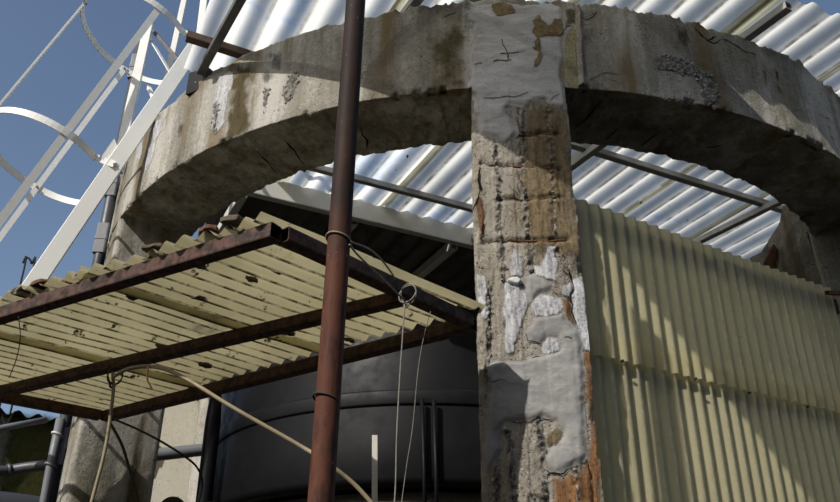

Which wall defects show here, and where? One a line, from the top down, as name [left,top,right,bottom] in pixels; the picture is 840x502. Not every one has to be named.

crack [694,27,756,55]
spalling [656,53,720,110]
peeling [477,274,493,319]
peeling [500,215,590,354]
crack [556,267,576,339]
rust [552,425,600,502]